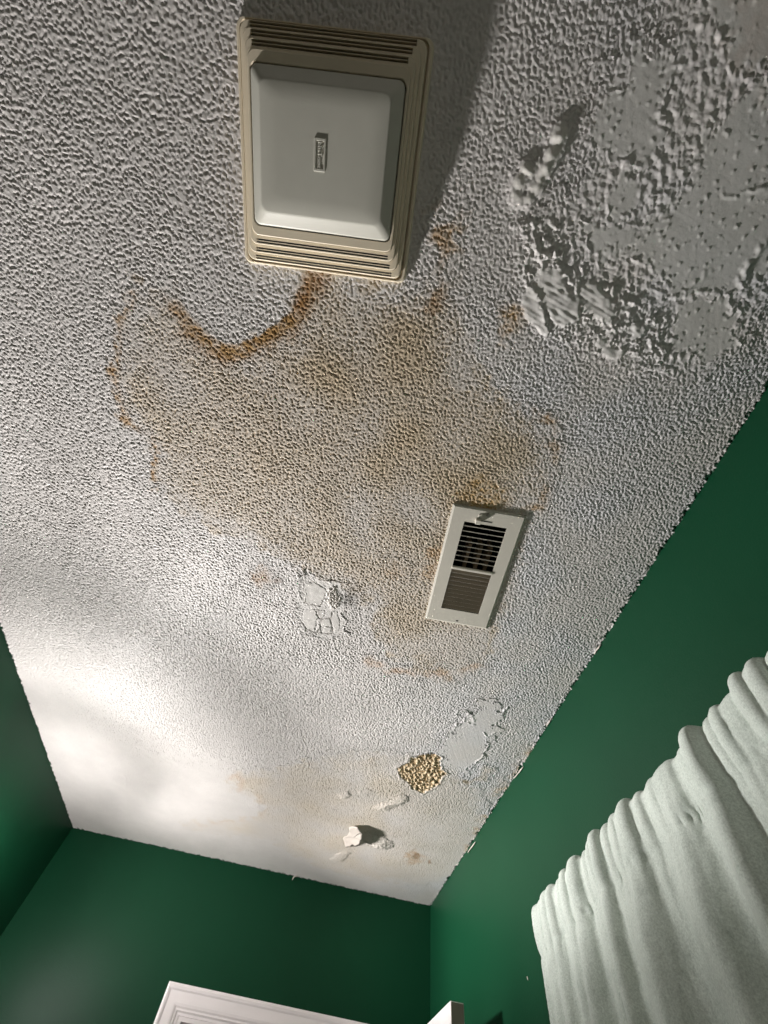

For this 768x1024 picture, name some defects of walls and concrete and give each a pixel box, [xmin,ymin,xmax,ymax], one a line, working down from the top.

flaking render [521,266,647,359]
leakage [104,207,568,684]
spalling [396,753,450,795]